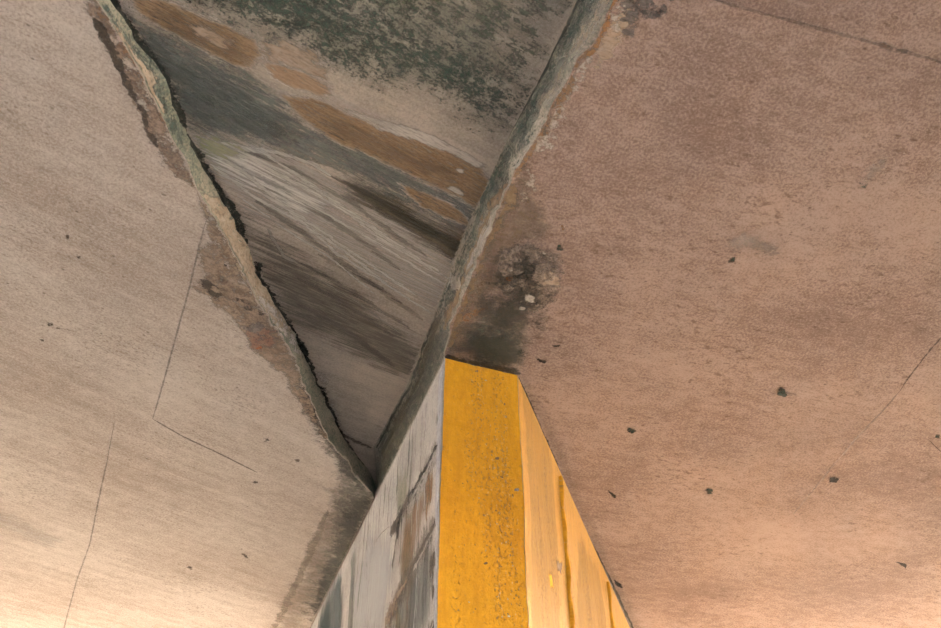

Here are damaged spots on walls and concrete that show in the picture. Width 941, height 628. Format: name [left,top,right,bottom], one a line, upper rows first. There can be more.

peeling [535,0,673,152]
crack [716,0,941,64]
spalling [86,0,327,439]
crack [110,0,372,472]
water stain [144,0,600,628]
spalling [479,242,565,330]
water stain [594,547,634,628]